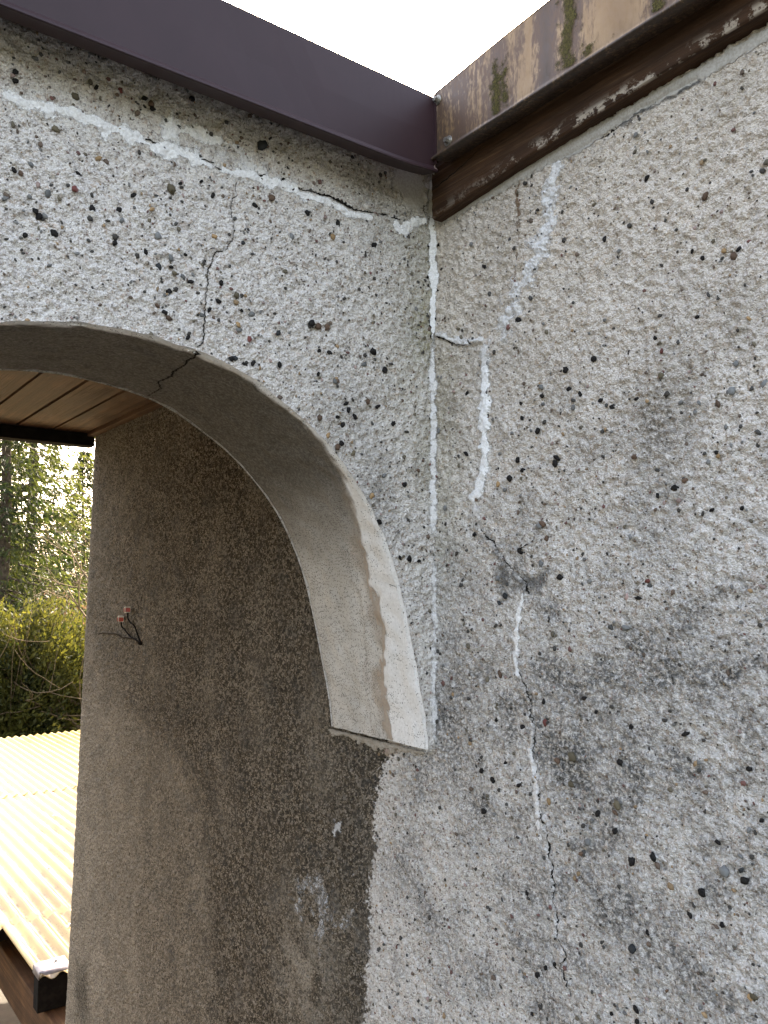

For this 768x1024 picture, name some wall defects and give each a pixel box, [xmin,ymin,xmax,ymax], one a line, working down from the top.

crack [1,88,428,396]
leakage [295,860,354,937]
crack [511,593,571,995]